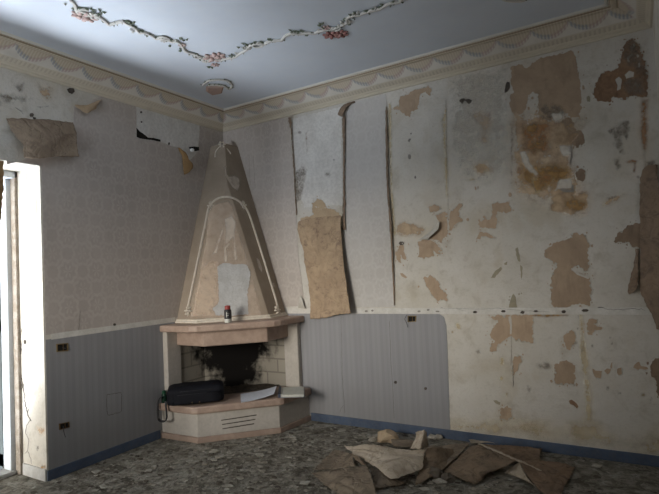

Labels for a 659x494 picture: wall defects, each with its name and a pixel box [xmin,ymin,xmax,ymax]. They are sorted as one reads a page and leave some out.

flaking render [136,107,200,160]
peeling [391,85,433,118]
damp [515,107,587,214]
peeling [505,37,650,192]
peeling [417,203,464,260]
peeling [418,274,449,304]
peeling [543,232,594,309]
peeling [485,293,535,355]
crack [21,375,32,464]